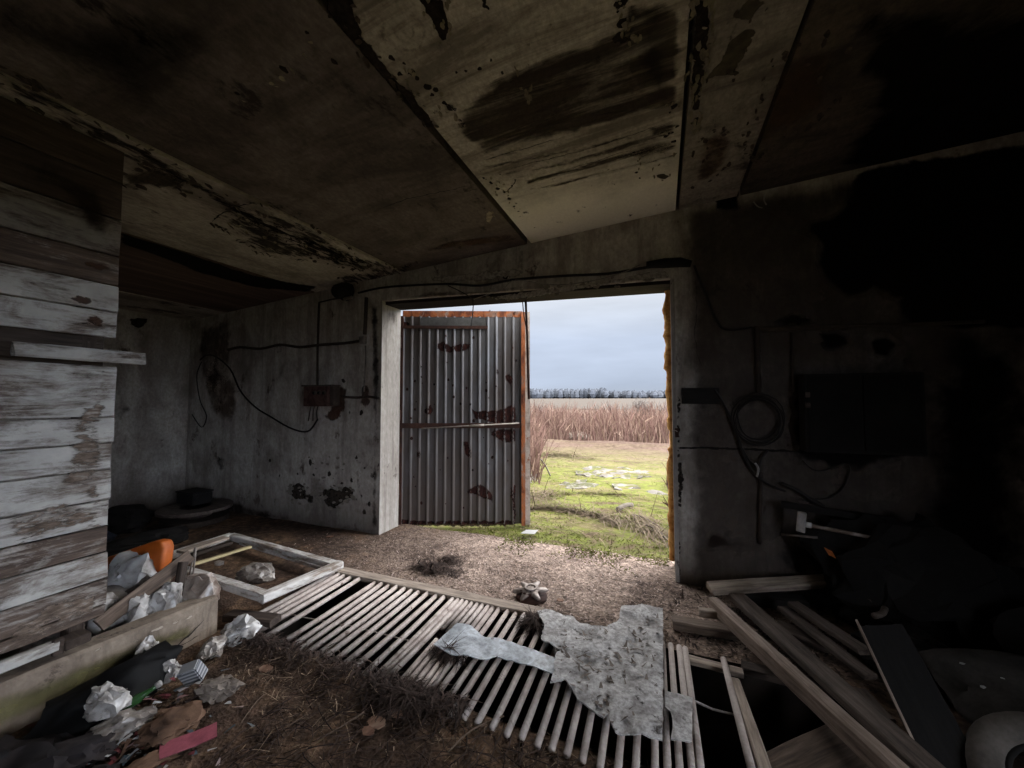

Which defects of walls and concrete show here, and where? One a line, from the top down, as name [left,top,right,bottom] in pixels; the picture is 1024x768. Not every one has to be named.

peeling [612,0,628,43]
spalling [324,0,465,132]
water stain [463,2,680,174]
peeling [652,0,768,189]
peeling [121,162,198,198]
water stain [528,125,673,187]
peeling [209,201,418,284]
corrosion [325,387,346,421]
peeling [11,402,105,545]
flaking render [279,455,373,514]